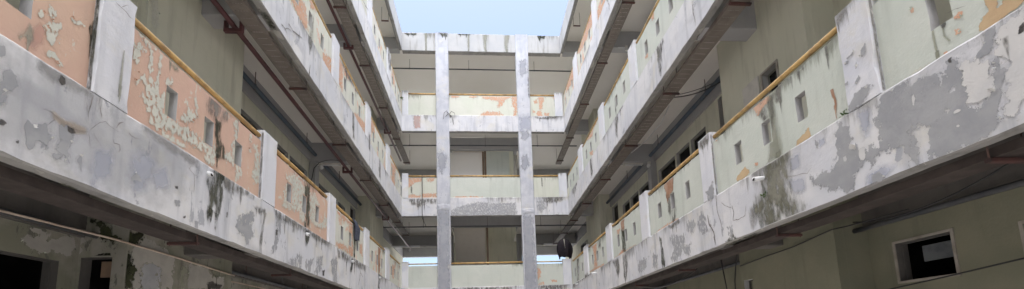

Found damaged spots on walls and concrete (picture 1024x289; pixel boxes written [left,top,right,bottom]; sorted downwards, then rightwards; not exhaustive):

peeling [38,4,86,85]
flaking render [0,69,18,106]
flaking render [16,120,84,171]
peeling [133,34,256,181]
peeling [451,96,517,116]
peeling [796,127,819,148]
flaking render [810,0,1024,193]
flaking render [657,181,714,262]